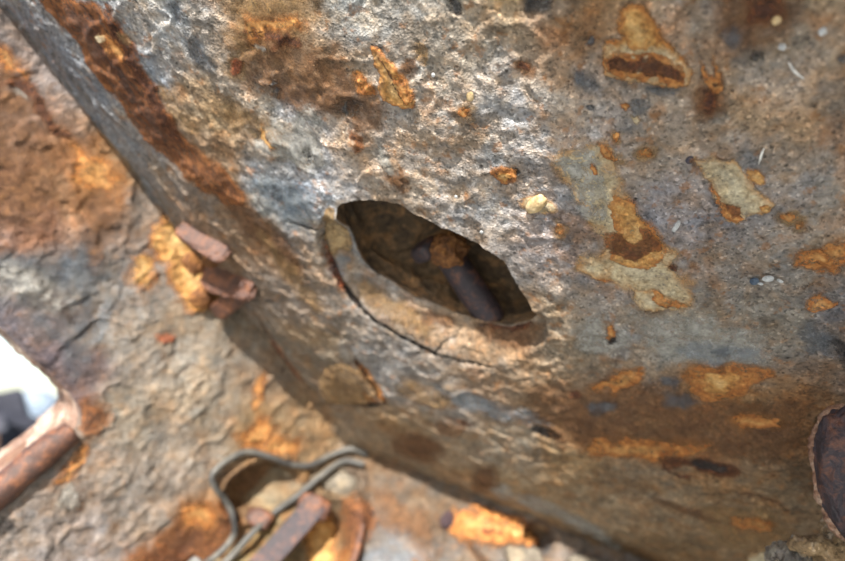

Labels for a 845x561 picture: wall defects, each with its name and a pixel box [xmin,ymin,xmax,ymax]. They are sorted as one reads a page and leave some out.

corrosion [228,0,382,153]
corrosion [401,59,416,75]
corrosion [40,0,300,278]
peeling [539,200,556,214]
crack [286,221,489,367]
spalling [322,200,476,318]
spalling [464,237,537,325]
corrosion [794,242,845,289]
corrosion [806,294,839,313]
corrosion [404,362,801,463]
corrosion [126,502,242,561]
corrosion [440,504,540,548]